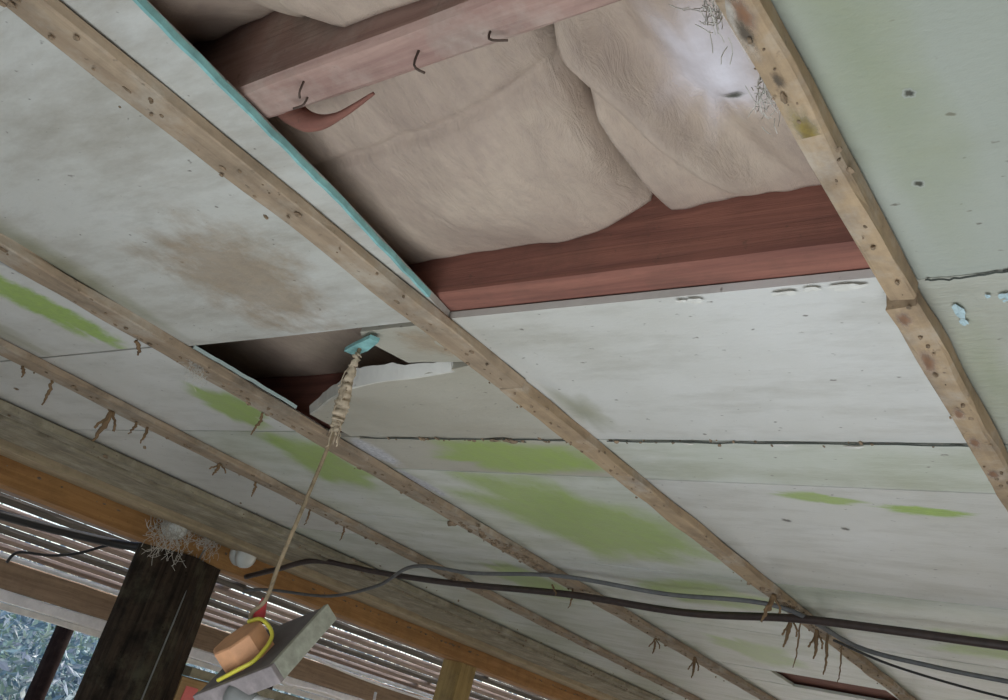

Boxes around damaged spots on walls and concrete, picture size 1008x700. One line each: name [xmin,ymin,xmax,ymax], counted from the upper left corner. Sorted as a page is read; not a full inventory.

spalling [133,0,431,297]
crack [925,269,1008,281]